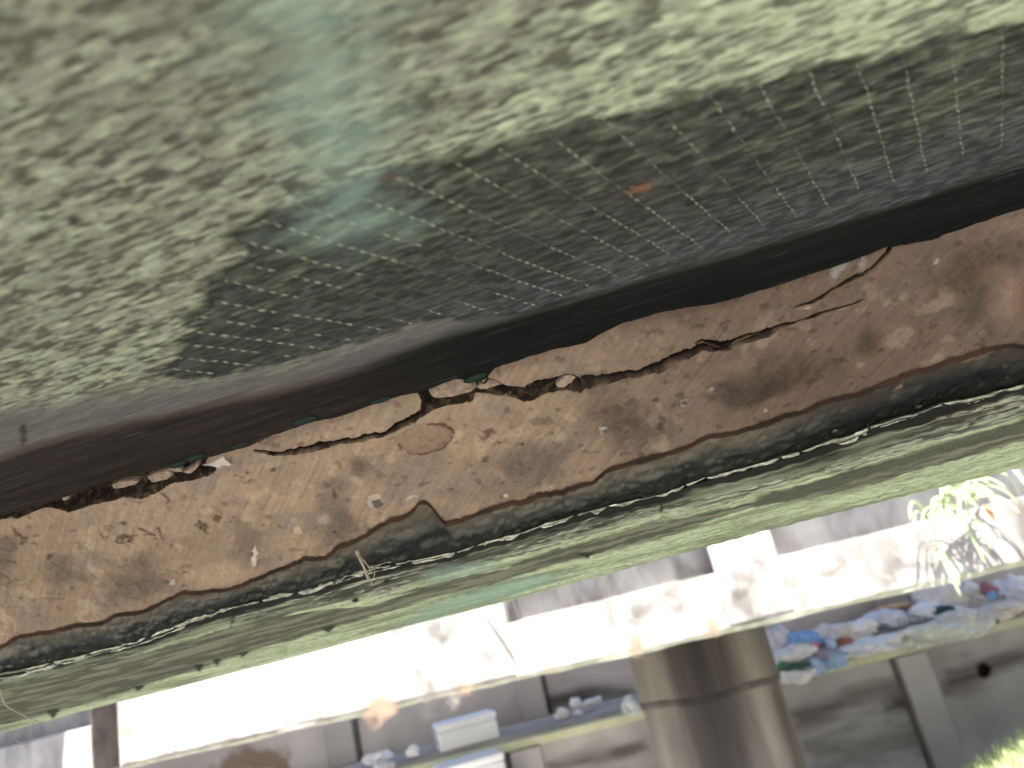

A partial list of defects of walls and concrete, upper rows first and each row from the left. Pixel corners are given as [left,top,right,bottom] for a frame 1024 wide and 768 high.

crack [570,247,892,390]
crack [254,411,426,456]